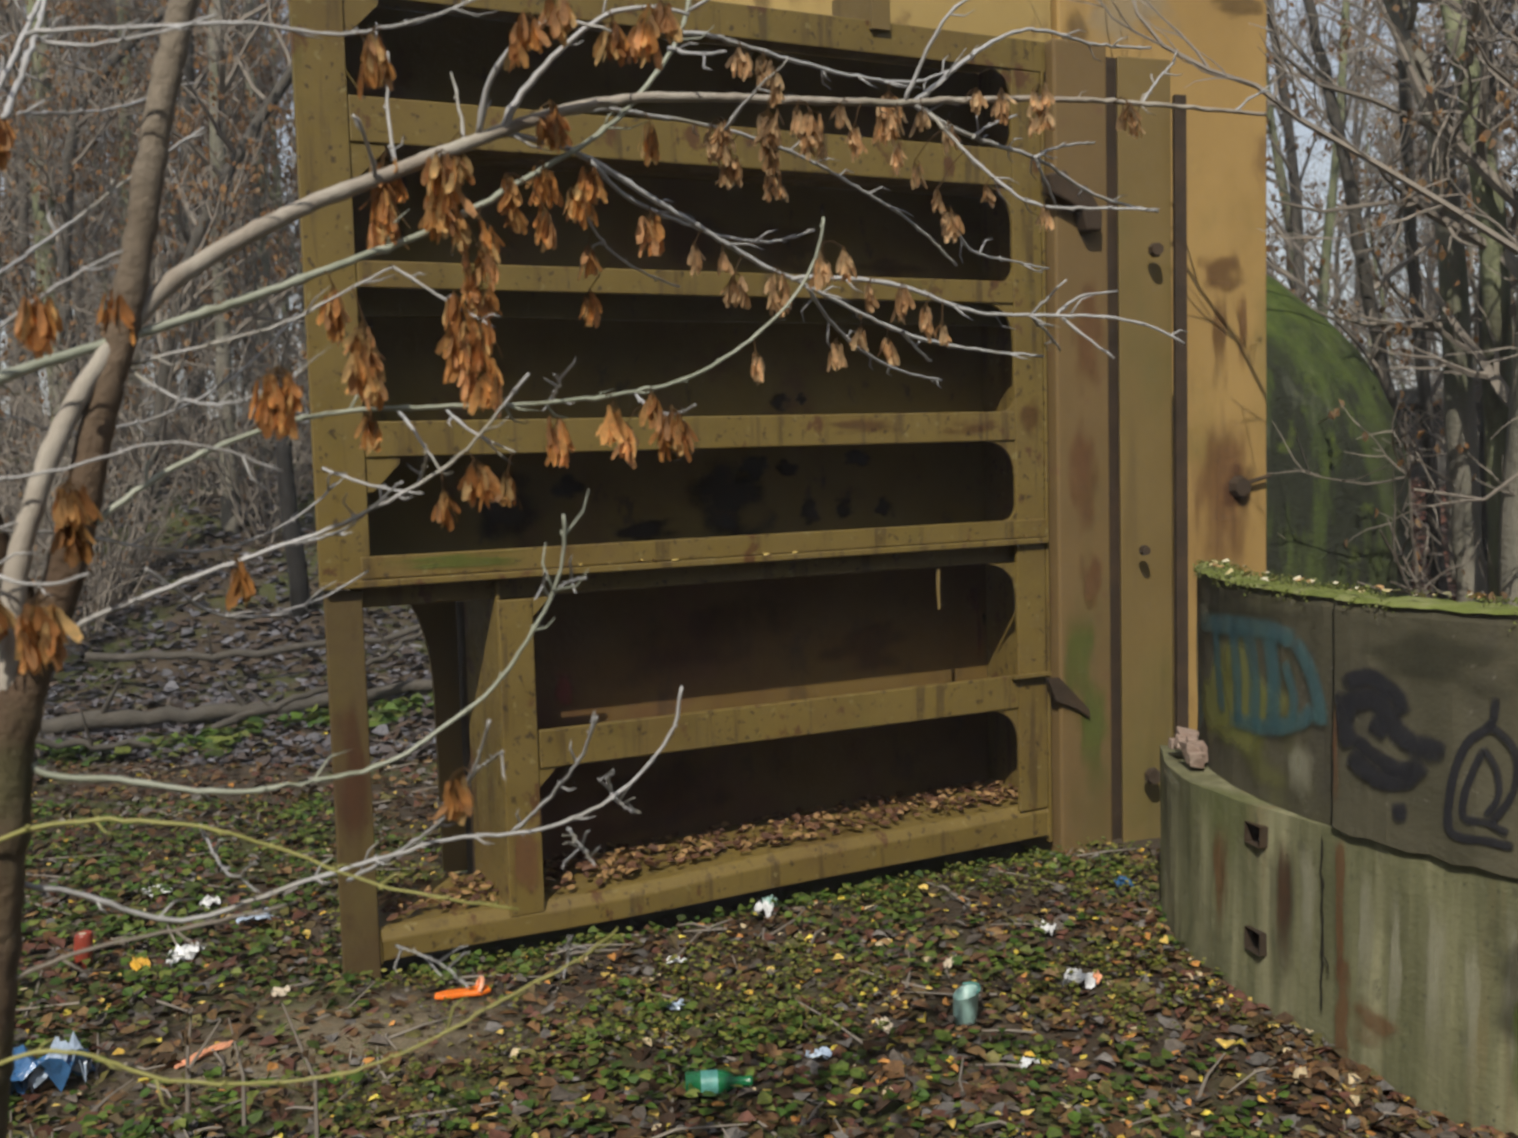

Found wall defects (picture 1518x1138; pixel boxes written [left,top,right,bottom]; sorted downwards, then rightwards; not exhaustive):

damp [1277,867,1311,932]